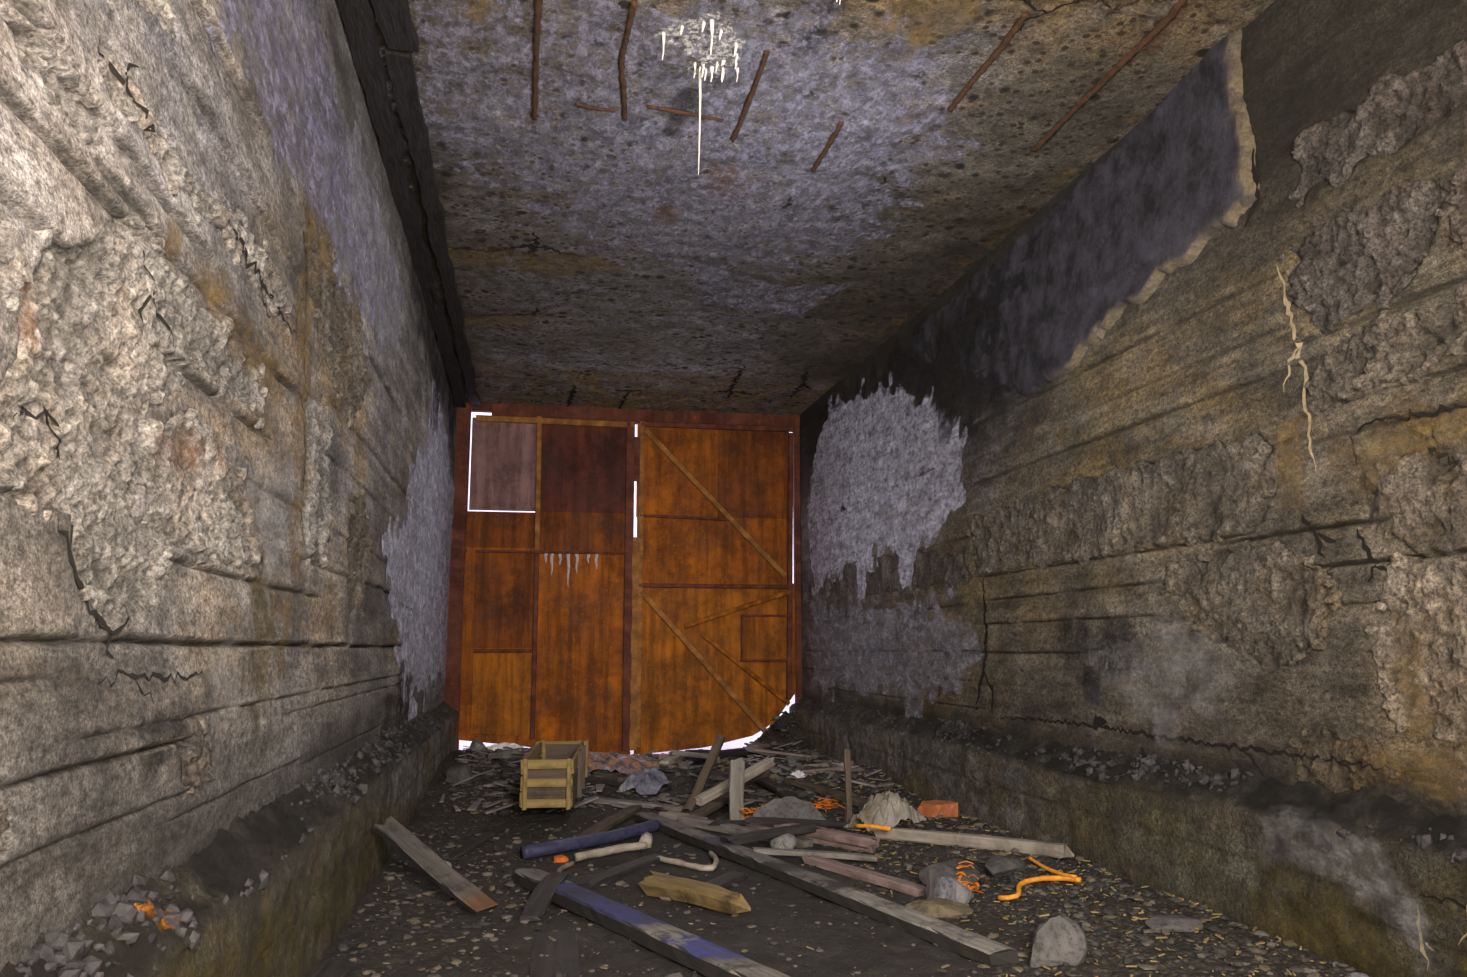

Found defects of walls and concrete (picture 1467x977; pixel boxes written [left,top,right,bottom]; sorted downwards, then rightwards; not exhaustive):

crack [99,52,156,136]
damp [656,12,745,175]
peeling [409,0,1030,316]
crack [1020,0,1084,31]
flaking render [908,30,1260,399]
spalling [1031,0,1187,152]
crack [58,521,203,703]
damp [381,664,412,734]